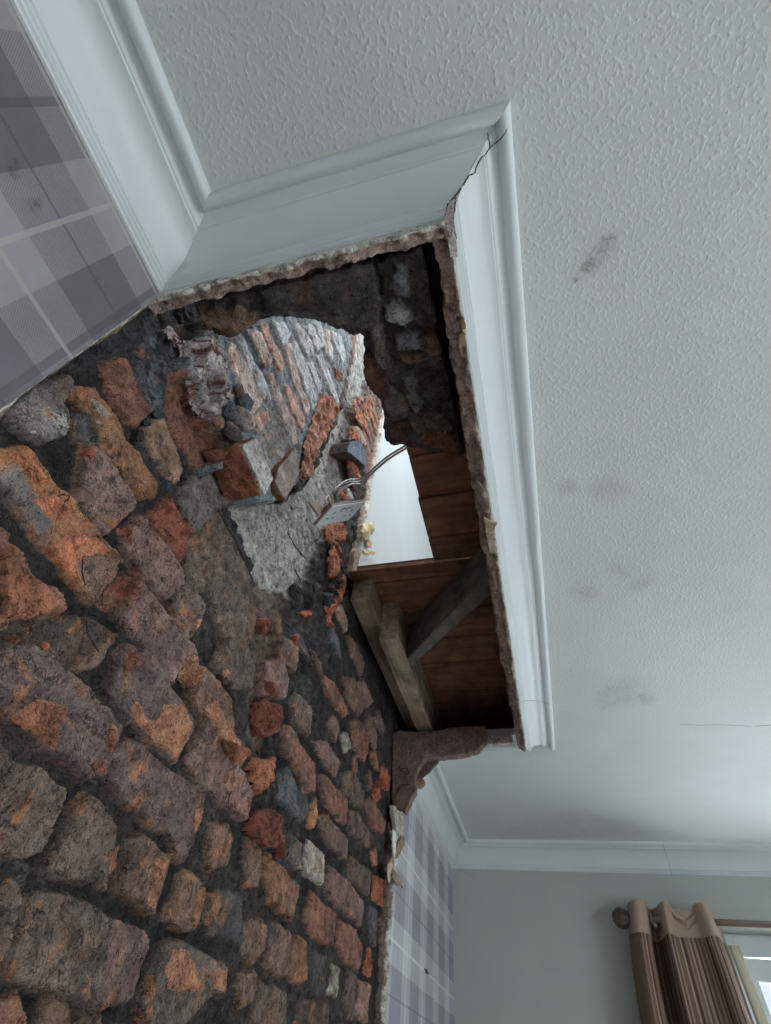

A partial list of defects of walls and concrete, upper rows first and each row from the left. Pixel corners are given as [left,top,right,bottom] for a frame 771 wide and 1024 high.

crack [445,129,507,239]
spalling [0,198,527,1024]